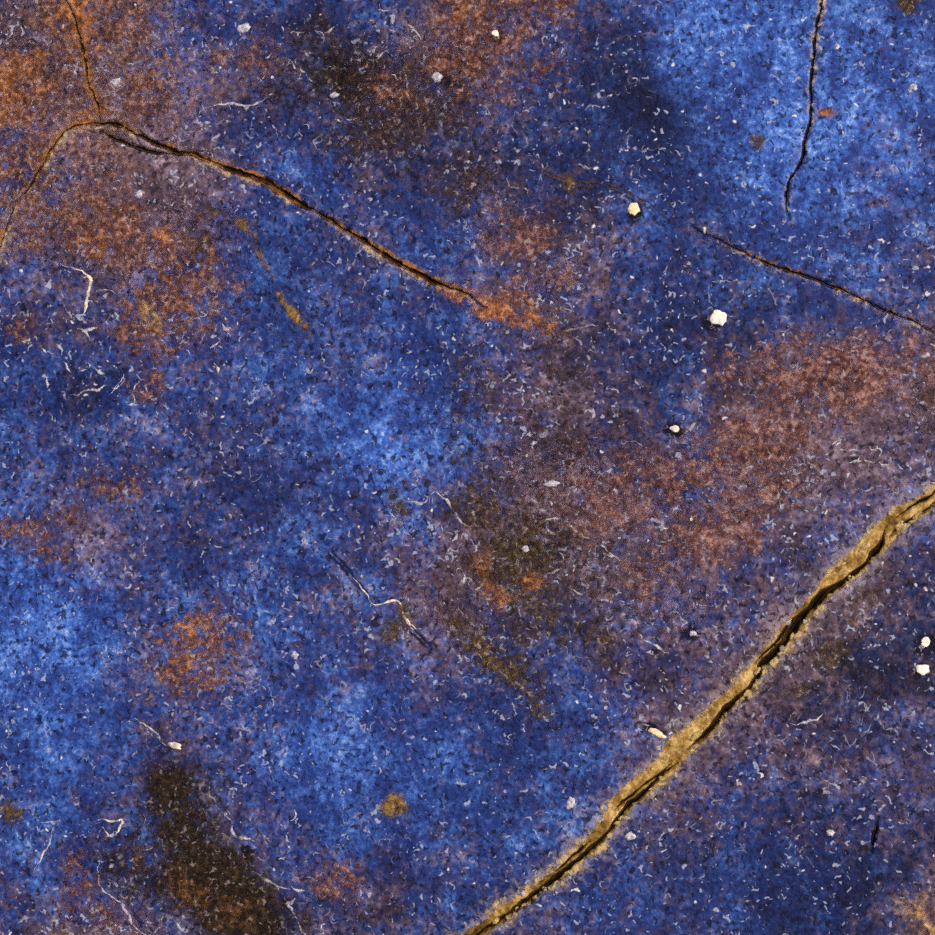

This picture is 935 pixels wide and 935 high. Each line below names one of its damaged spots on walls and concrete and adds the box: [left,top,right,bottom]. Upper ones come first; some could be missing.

crack [0,0,484,307]
crack [540,172,667,218]
crack [785,0,826,217]
crack [691,225,934,333]
crack [329,550,434,651]
crack [462,484,935,935]
damp [102,749,297,935]